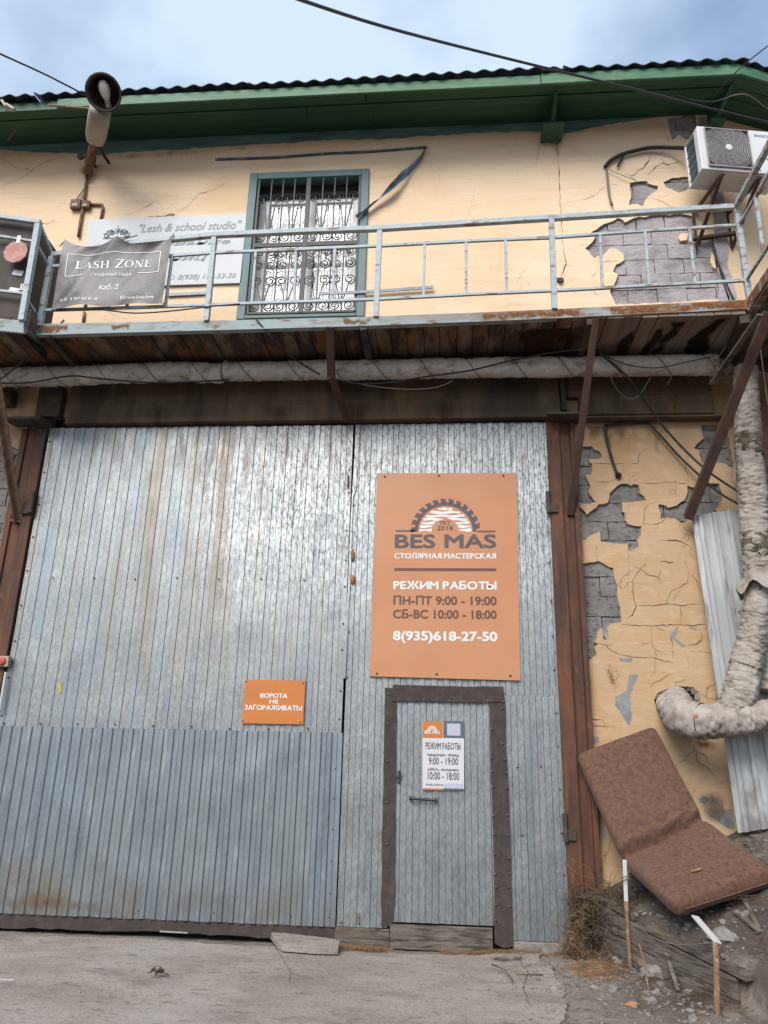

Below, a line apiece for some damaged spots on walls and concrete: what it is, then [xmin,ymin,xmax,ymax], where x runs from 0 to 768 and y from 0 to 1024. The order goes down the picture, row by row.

spalling [667,115,708,140]
crack [537,143,620,295]
spalling [585,177,736,305]
corrosion [483,309,579,320]
corrosion [611,301,743,314]
spalling [694,425,733,468]
spalling [578,446,646,551]
spalling [658,483,723,524]
crack [595,449,707,687]
spalling [583,561,621,660]
peeling [615,674,638,725]
hole [654,686,701,705]